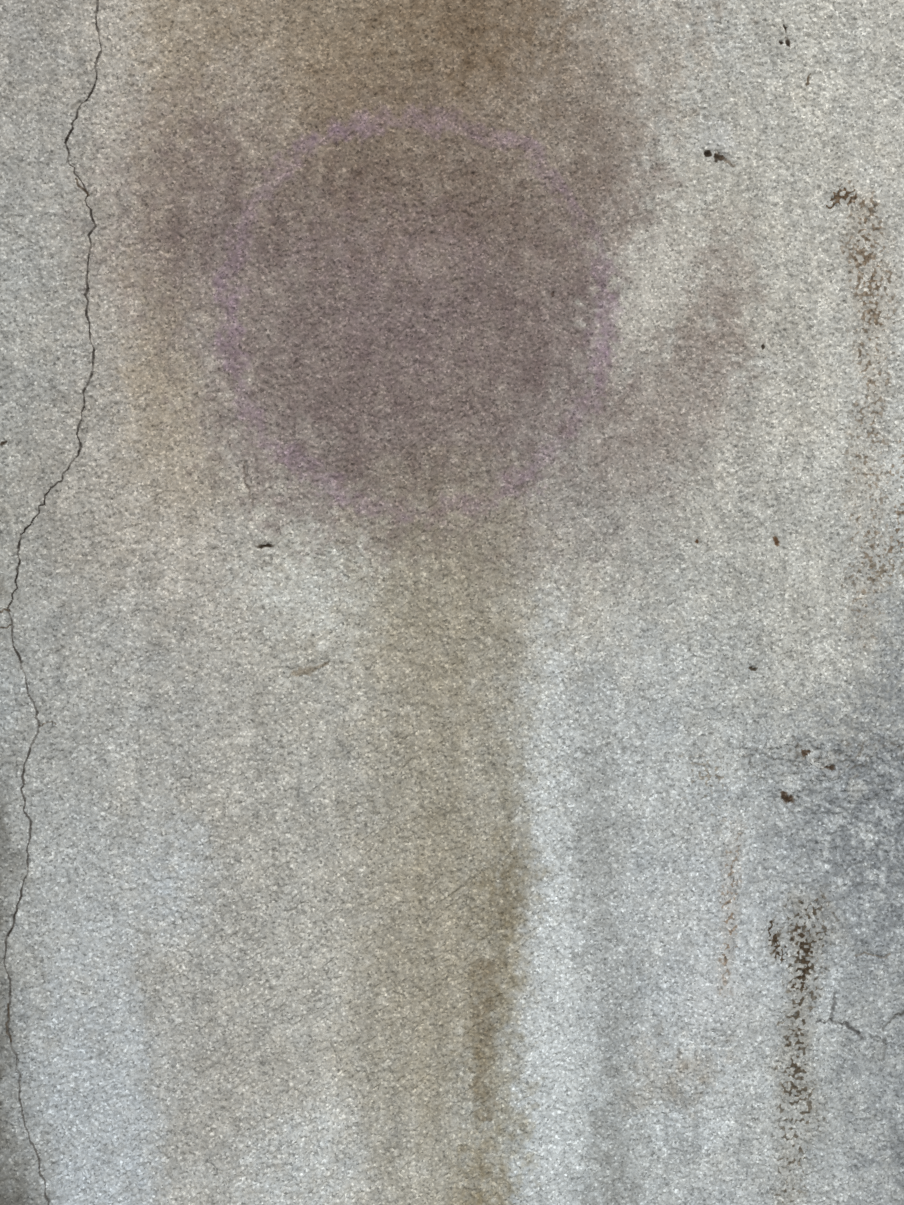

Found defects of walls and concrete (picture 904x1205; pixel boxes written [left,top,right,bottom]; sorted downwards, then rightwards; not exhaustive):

damp [82,0,201,166]
crack [0,0,103,1205]
damp [0,296,741,1205]
damp [672,180,904,1205]